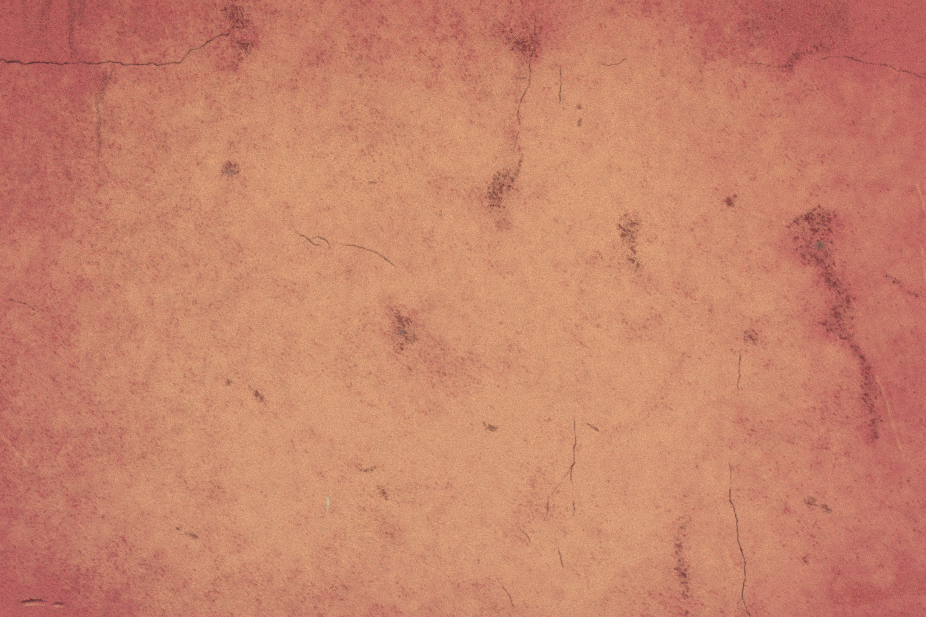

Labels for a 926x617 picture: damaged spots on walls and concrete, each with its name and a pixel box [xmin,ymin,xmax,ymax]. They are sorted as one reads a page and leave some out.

crack [8,22,236,73]
crack [729,465,750,616]